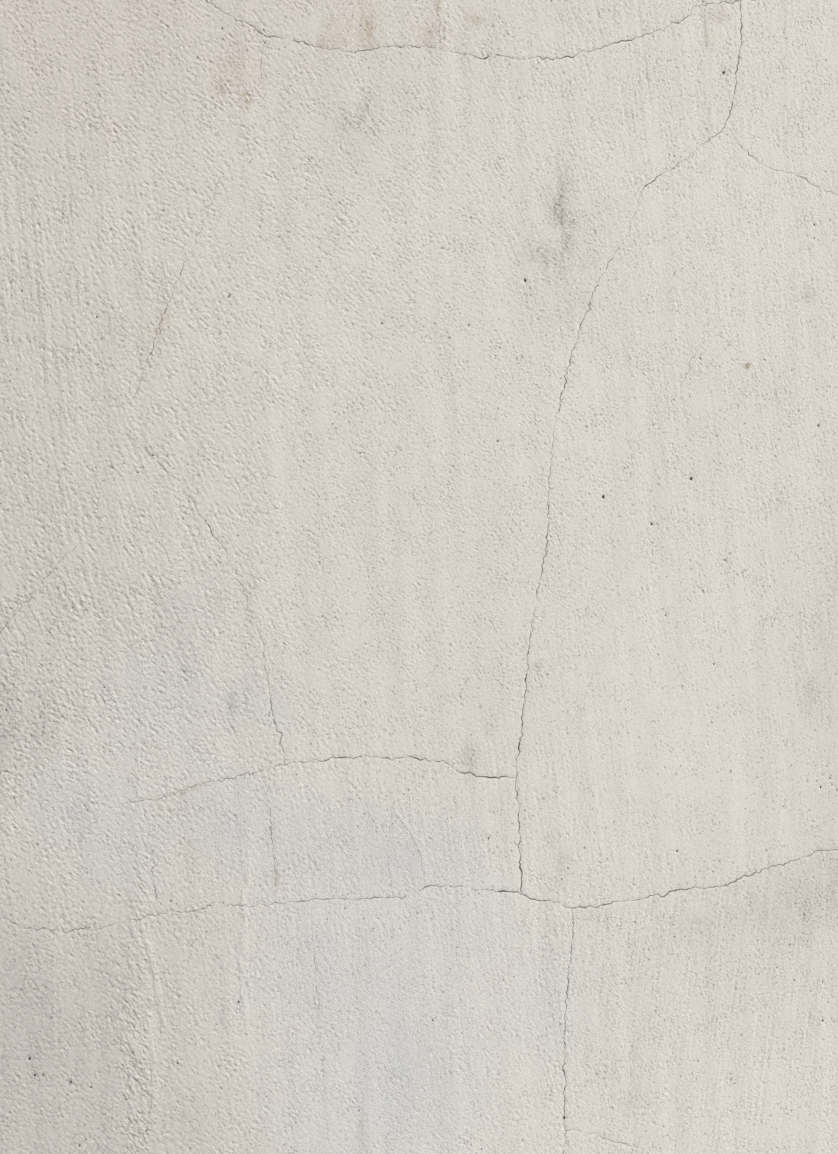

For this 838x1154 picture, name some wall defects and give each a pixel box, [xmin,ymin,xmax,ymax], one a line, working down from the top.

crack [258,614,838,1136]